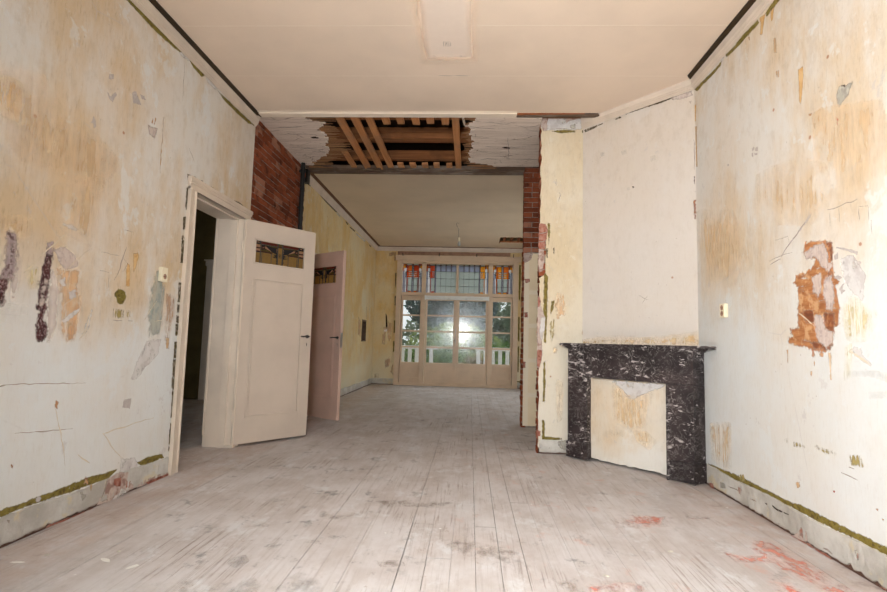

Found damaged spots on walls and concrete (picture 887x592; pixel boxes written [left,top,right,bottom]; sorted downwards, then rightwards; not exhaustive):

spalling [836,83,852,105]
spalling [524,223,548,272]
peeling [834,247,866,300]
crack [0,380,75,388]
crack [21,409,65,460]